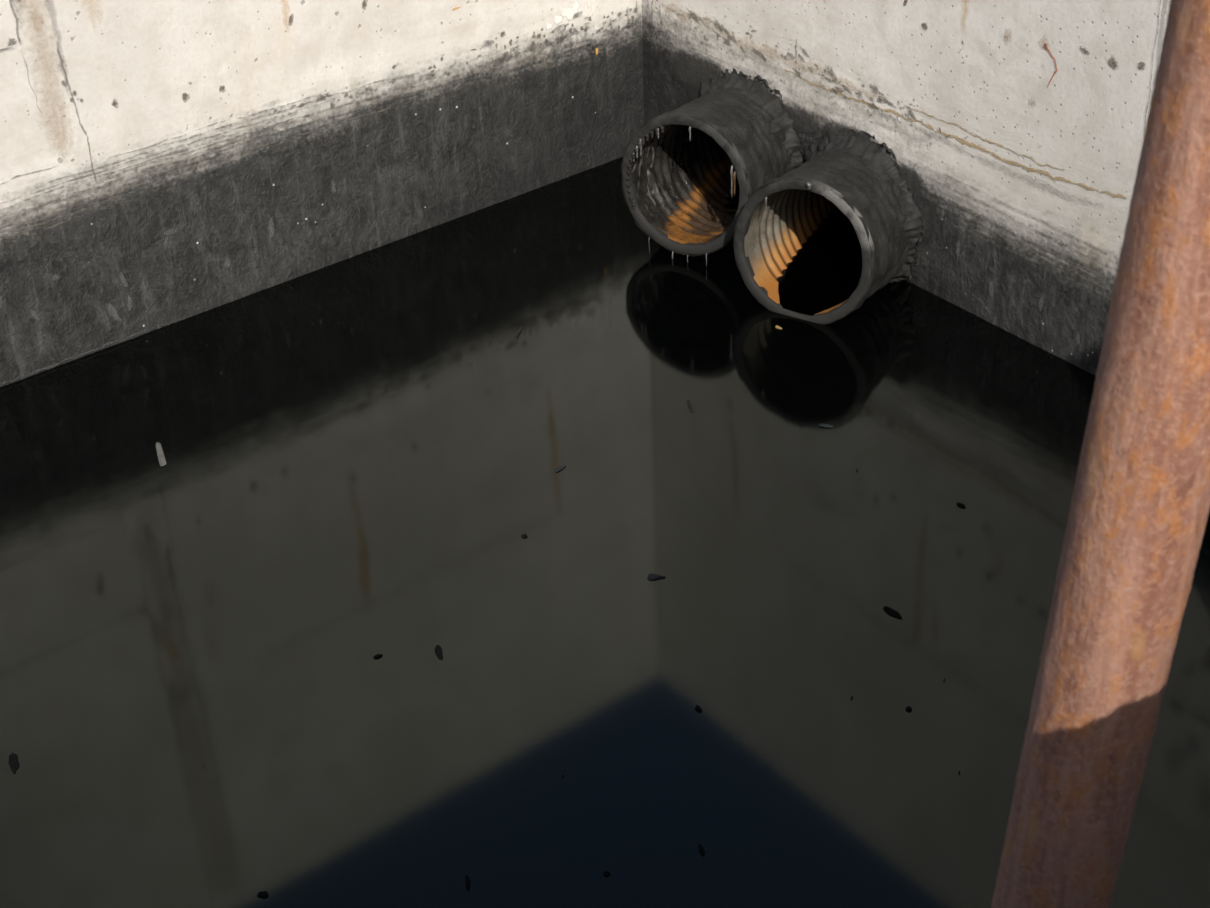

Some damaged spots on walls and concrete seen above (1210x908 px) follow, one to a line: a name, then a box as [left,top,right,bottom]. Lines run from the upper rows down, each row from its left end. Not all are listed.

crack [1,2,20,50]
crack [57,49,96,180]
damp [0,7,879,387]
damp [785,70,1127,199]
crack [1043,43,1057,87]
damp [891,158,1116,376]